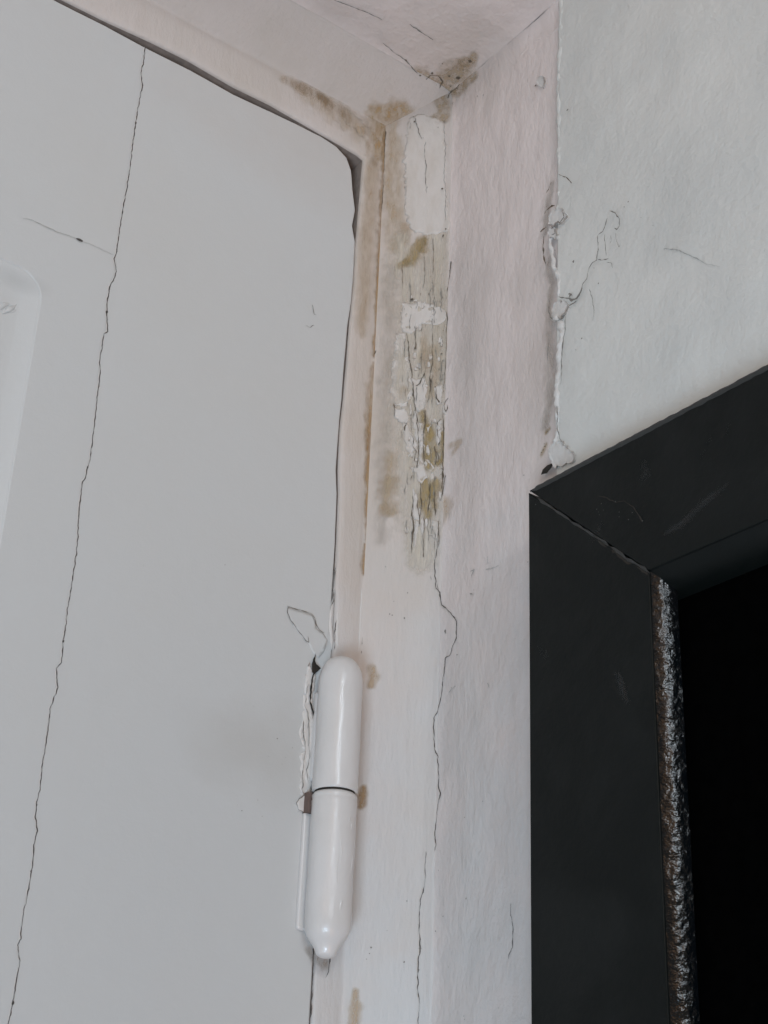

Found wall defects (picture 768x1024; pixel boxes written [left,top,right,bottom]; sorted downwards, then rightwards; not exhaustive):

crack [337,1,418,74]
leakage [417,53,476,121]
peeling [389,114,451,571]
crack [560,201,629,339]
crack [6,48,145,1024]
leakage [420,411,444,518]
spalling [287,607,327,813]
crack [404,532,457,1022]